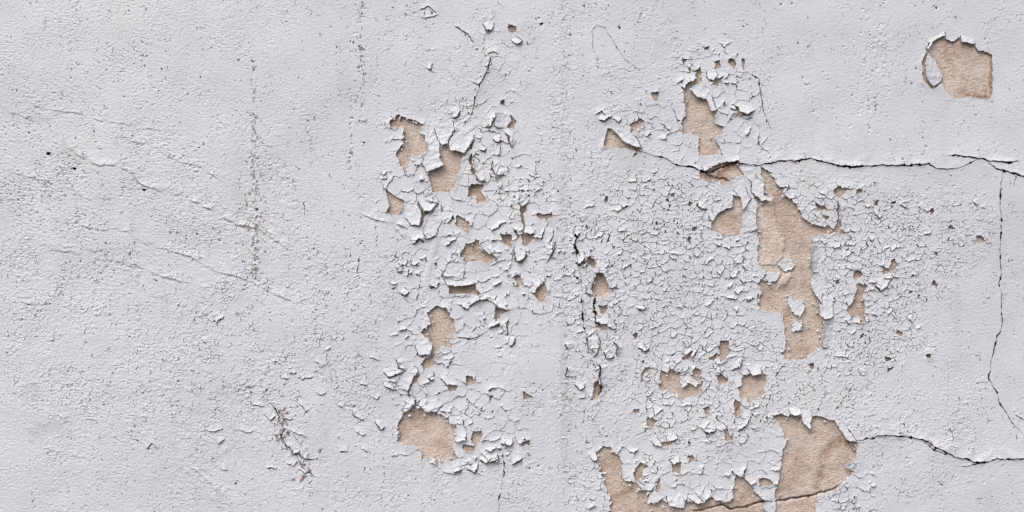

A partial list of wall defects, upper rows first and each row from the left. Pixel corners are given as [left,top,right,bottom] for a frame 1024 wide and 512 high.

peeling [919,33,993,100]
peeling [161,0,945,512]
crack [572,226,601,330]
crack [633,149,1024,432]
crack [596,366,604,396]
crack [856,433,1024,467]